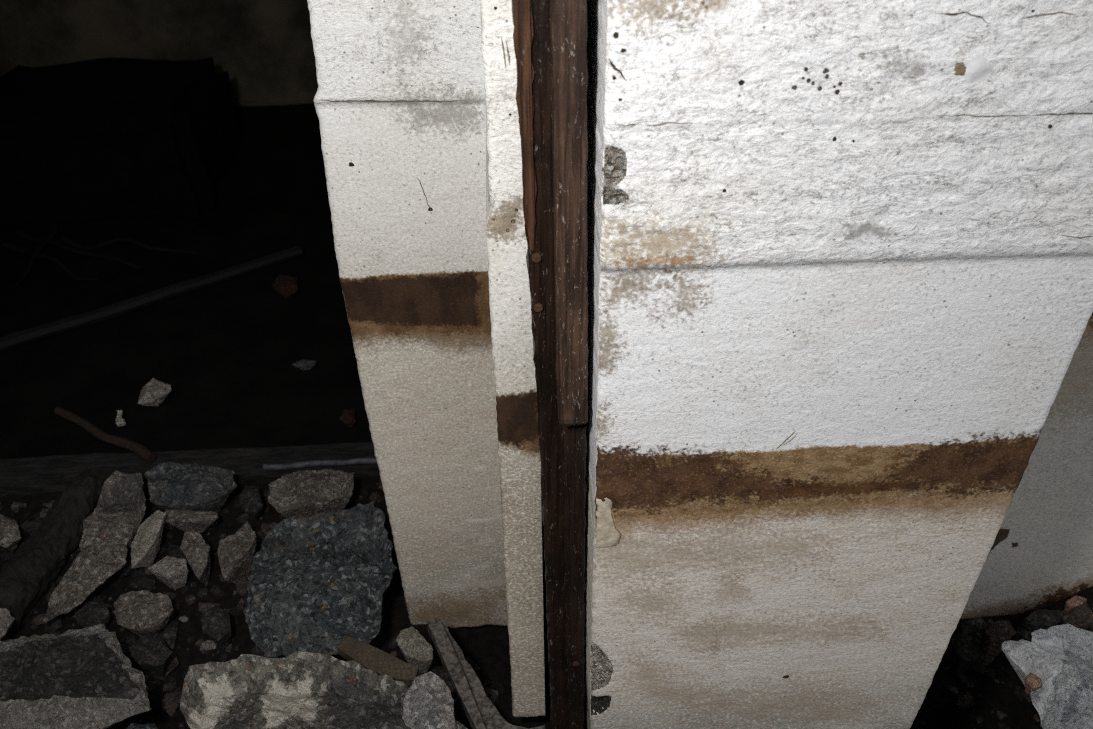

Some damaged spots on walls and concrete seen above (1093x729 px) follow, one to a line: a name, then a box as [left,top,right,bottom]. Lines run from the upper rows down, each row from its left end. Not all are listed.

water stain [339,271,492,347]
water stain [496,391,540,455]
water stain [595,430,1042,529]
peeling [988,529,1018,555]